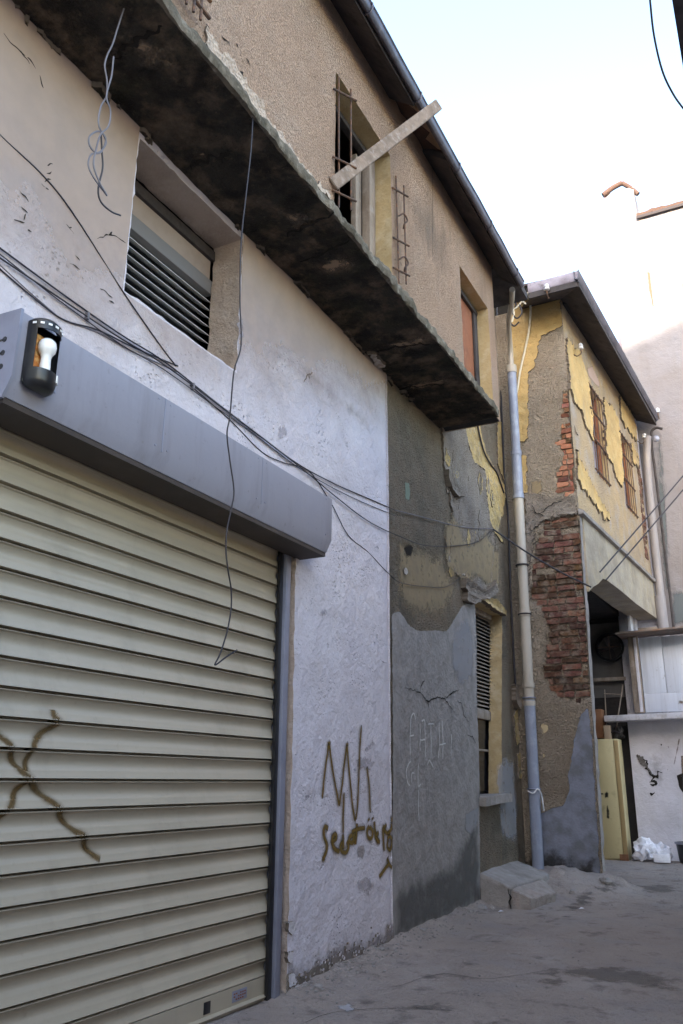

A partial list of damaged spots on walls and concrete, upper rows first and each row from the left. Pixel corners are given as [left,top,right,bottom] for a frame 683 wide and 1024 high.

spalling [91,81,122,110]
spalling [139,127,153,146]
flaking render [204,25,331,199]
water stain [317,259,354,274]
spalling [343,330,415,402]
flaking render [440,421,506,605]
spalling [511,297,649,703]
spalling [402,544,413,575]
crack [407,680,476,743]
flaking render [636,754,662,796]